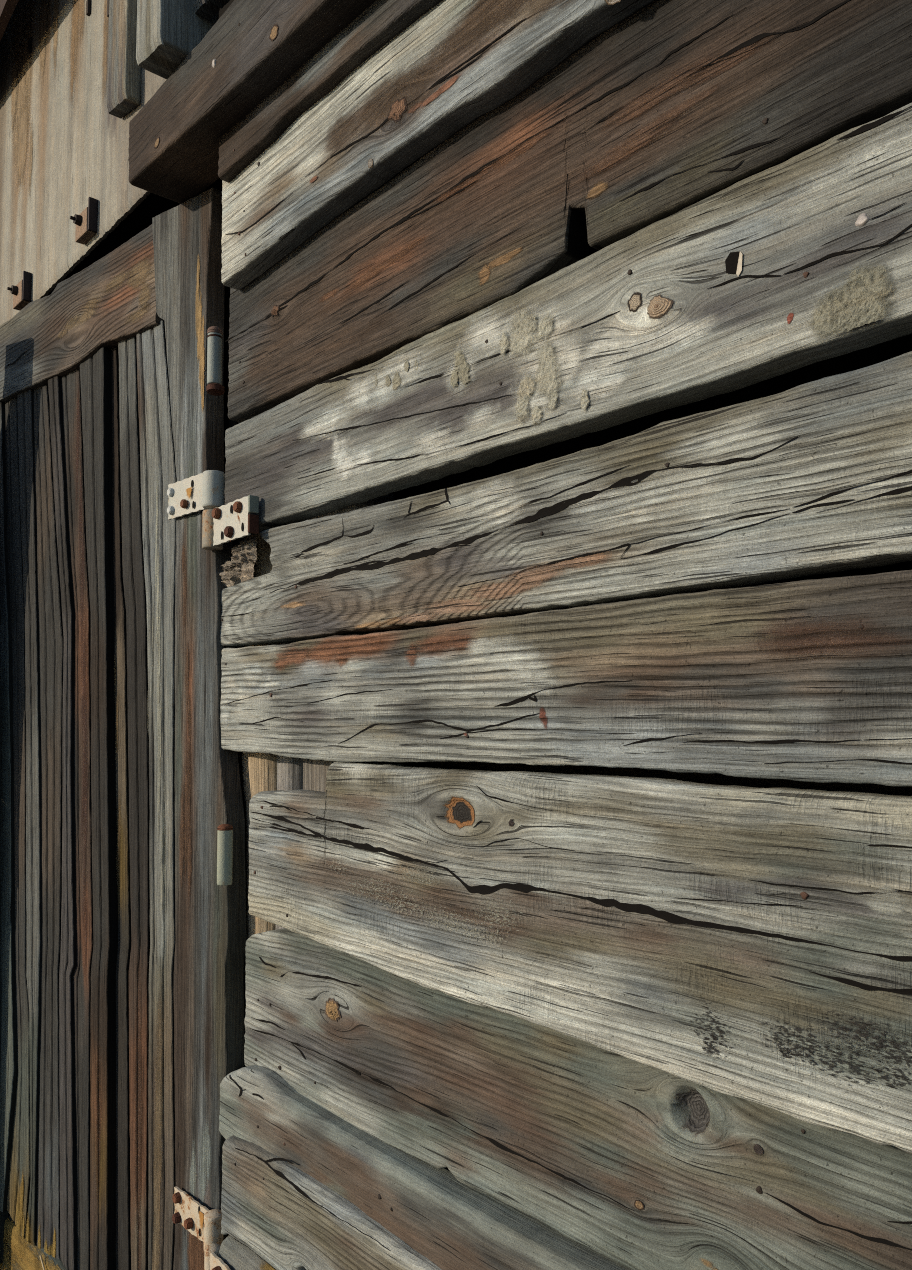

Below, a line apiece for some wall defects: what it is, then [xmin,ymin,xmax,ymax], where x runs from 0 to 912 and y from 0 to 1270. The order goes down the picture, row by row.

crack [221,436,798,617]
crack [458,470,912,587]
crack [473,786,574,851]
crack [251,800,912,995]
mould [686,1002,738,1059]
mould [755,1010,912,1096]
rust [188,1211,204,1270]